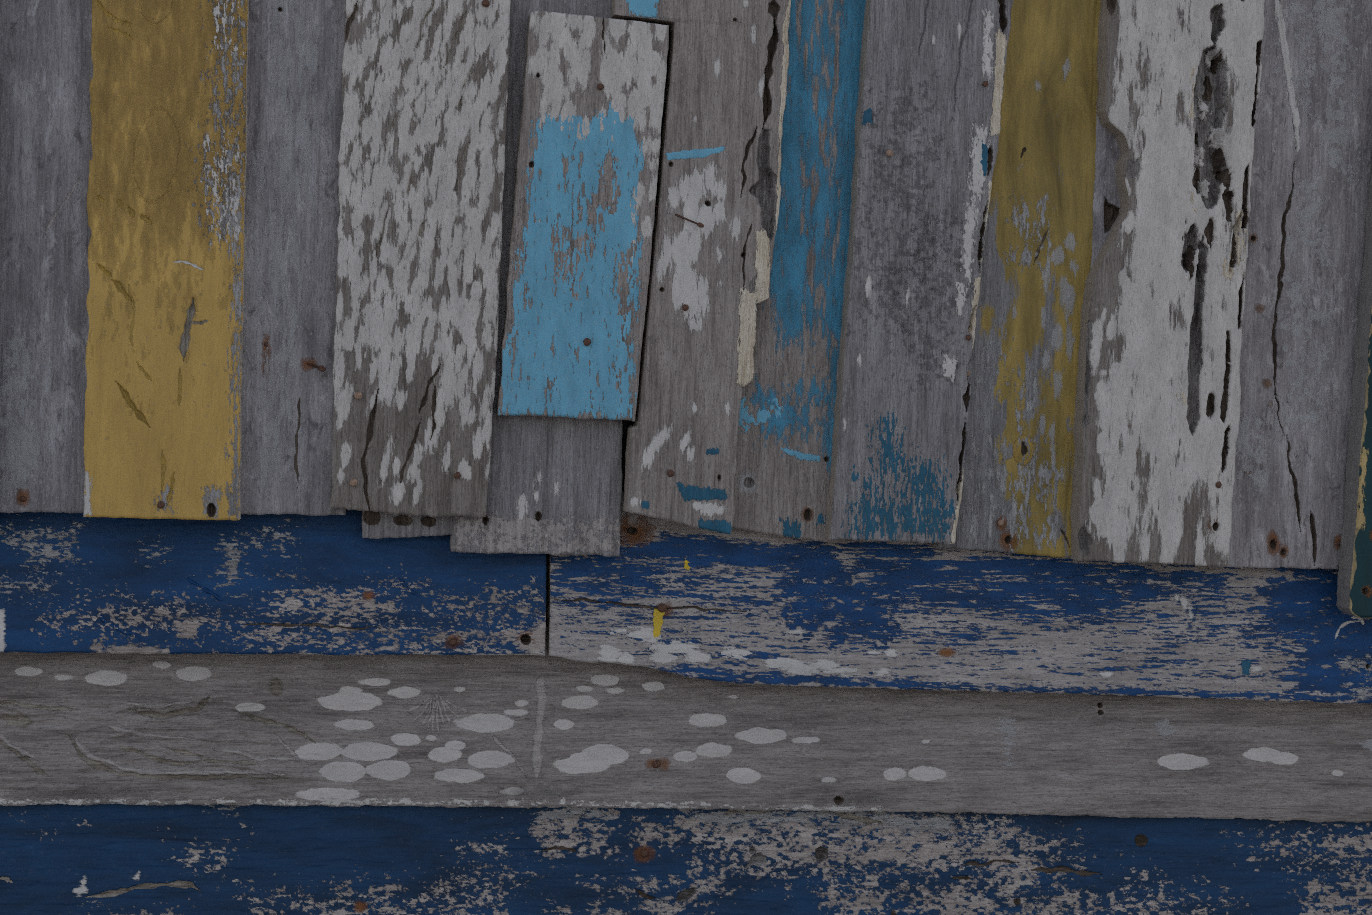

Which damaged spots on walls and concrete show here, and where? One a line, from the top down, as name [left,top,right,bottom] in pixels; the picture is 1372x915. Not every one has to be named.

crack [740,20,778,290]
peeling [0,0,1372,704]
crack [1271,115,1317,566]
peeling [0,734,1249,915]
peeling [1220,821,1372,915]